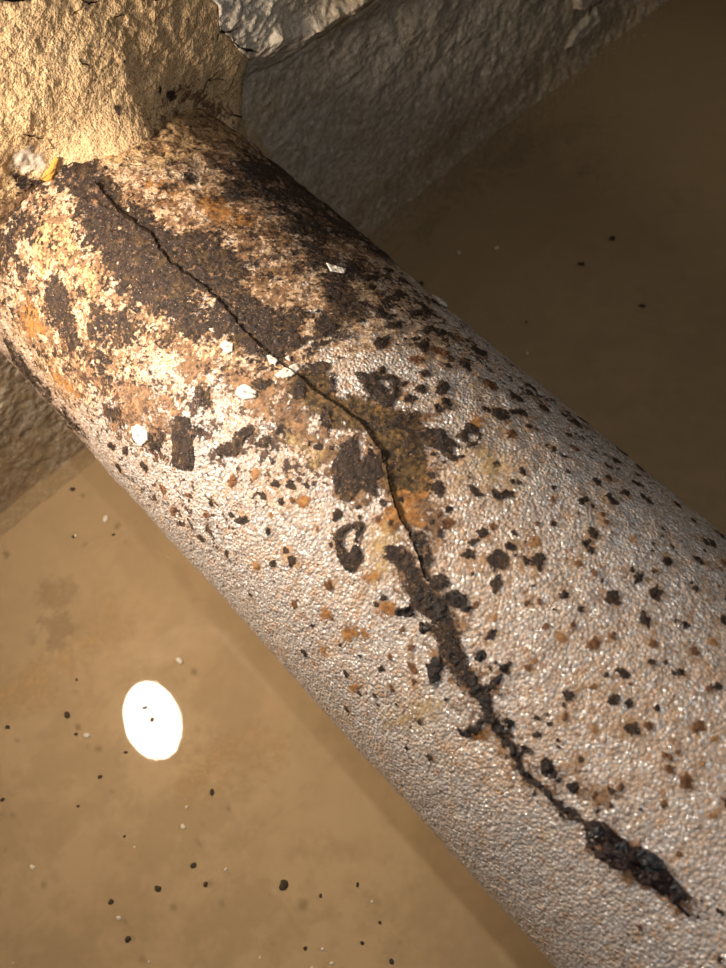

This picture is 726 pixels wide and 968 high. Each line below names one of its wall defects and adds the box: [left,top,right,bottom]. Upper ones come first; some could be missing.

flaking render [0,0,249,229]
water stain [140,85,232,138]
corrosion [0,80,670,864]
crack [95,181,694,918]
corrosion [616,868,701,920]